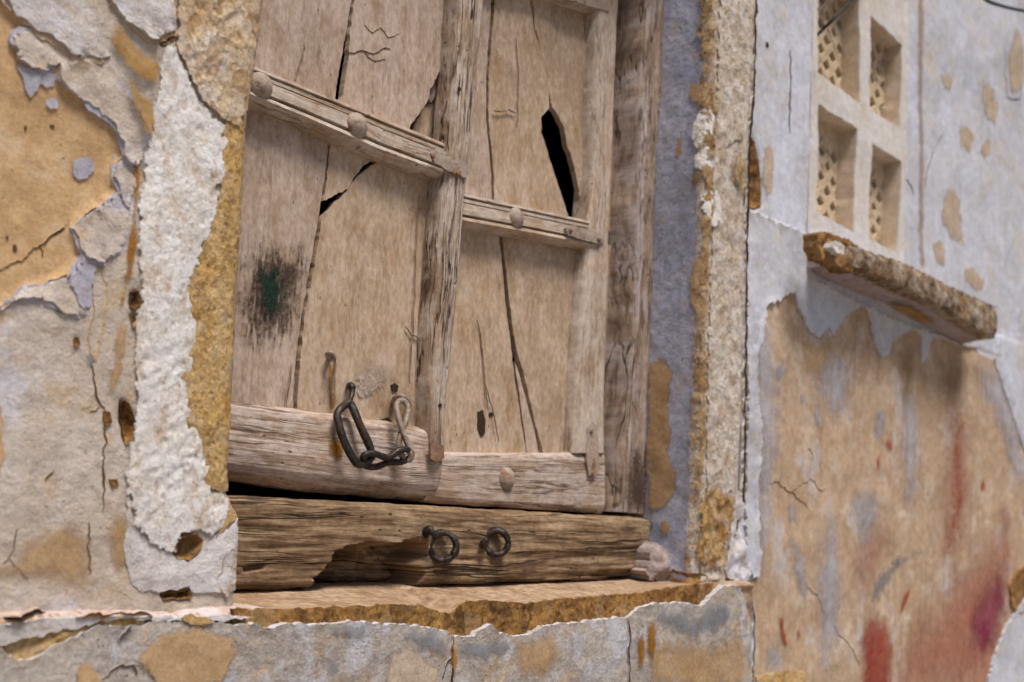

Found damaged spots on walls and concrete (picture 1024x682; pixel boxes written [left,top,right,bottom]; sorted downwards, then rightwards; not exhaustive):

crack [0,207,87,271]
crack [86,364,108,575]
rust [121,163,140,302]
flaking render [0,0,263,552]
flaking render [646,358,677,509]
crack [734,0,827,537]
flaking render [676,0,1024,682]
spalling [0,548,714,682]